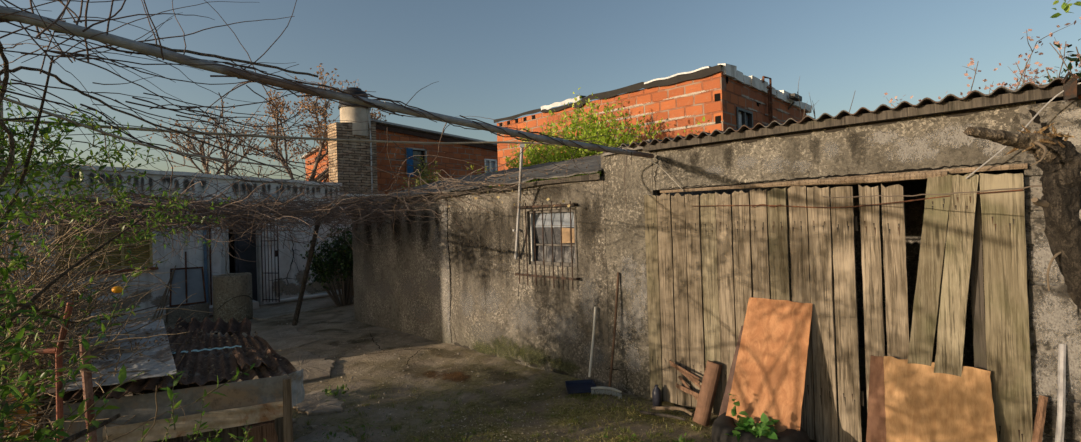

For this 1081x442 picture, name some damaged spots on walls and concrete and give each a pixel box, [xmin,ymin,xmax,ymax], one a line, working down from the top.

peeling [1057,109,1081,147]
damp [581,199,600,245]
damp [355,203,517,325]